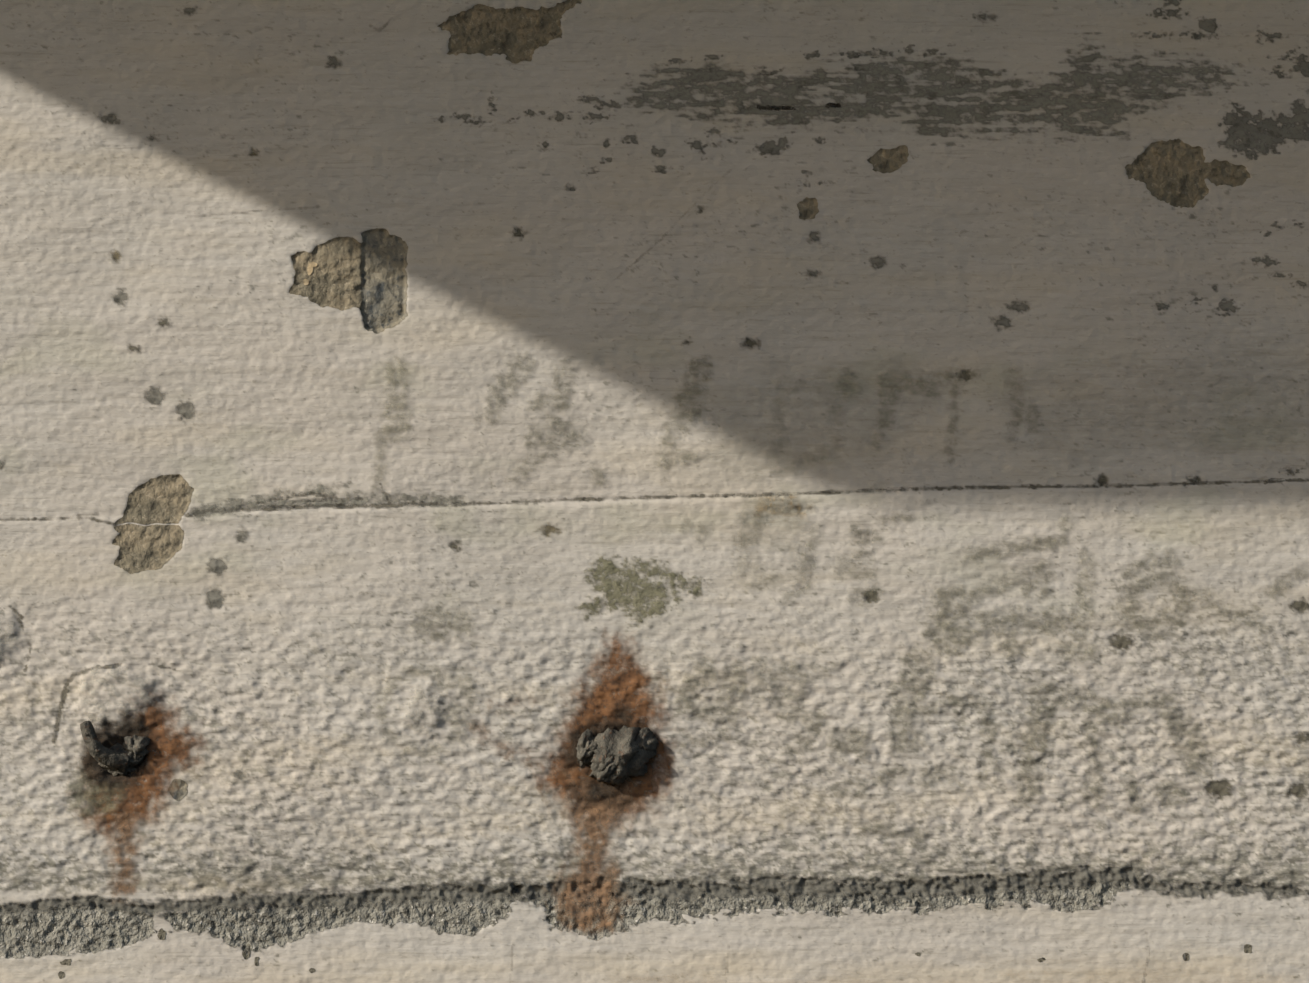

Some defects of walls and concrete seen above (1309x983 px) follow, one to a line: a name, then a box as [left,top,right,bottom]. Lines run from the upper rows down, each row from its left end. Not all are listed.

spalling [437,0,582,64]
peeling [512,0,1309,208]
spalling [289,228,408,334]
peeling [1194,286,1240,317]
peeling [1252,256,1306,287]
crack [6,514,116,526]
spalling [112,474,464,574]
crack [185,478,1309,517]
corrosion [70,700,197,893]
corrosion [539,640,672,931]
peeling [0,887,515,979]
peeling [530,877,1131,941]